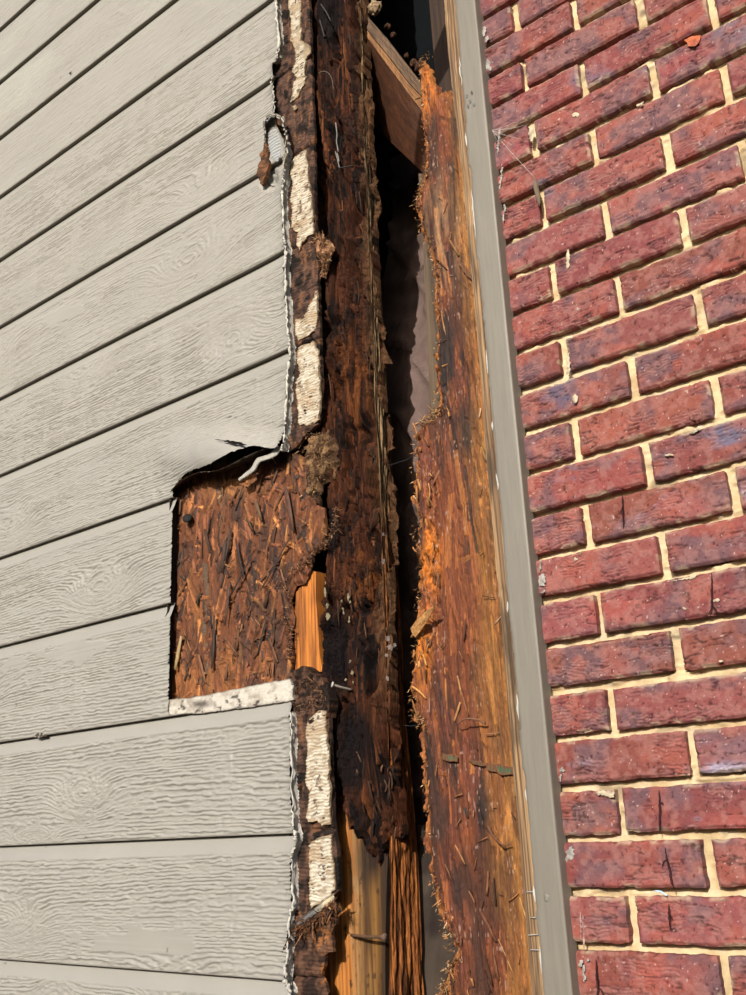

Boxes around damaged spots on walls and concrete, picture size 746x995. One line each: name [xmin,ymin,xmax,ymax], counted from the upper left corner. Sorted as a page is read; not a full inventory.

peeling [256,0,322,452]
crack [215,438,247,446]
peeling [282,710,336,995]